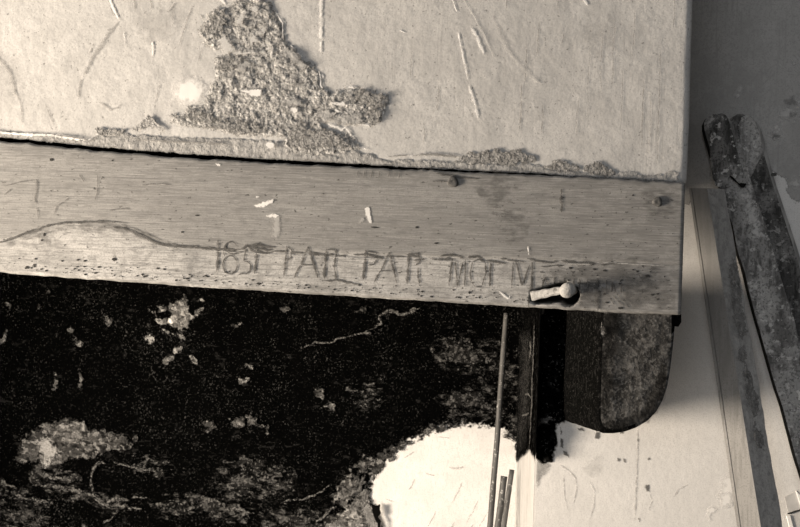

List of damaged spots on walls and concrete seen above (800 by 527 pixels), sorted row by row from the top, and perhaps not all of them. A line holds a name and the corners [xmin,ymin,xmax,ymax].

peeling [0,0,800,205]
peeling [149,306,198,365]
peeling [245,414,269,435]
peeling [314,388,336,412]
peeling [346,377,384,411]
peeling [421,384,517,441]
spalling [0,417,170,527]
peeling [148,492,249,525]
spalling [260,473,382,527]